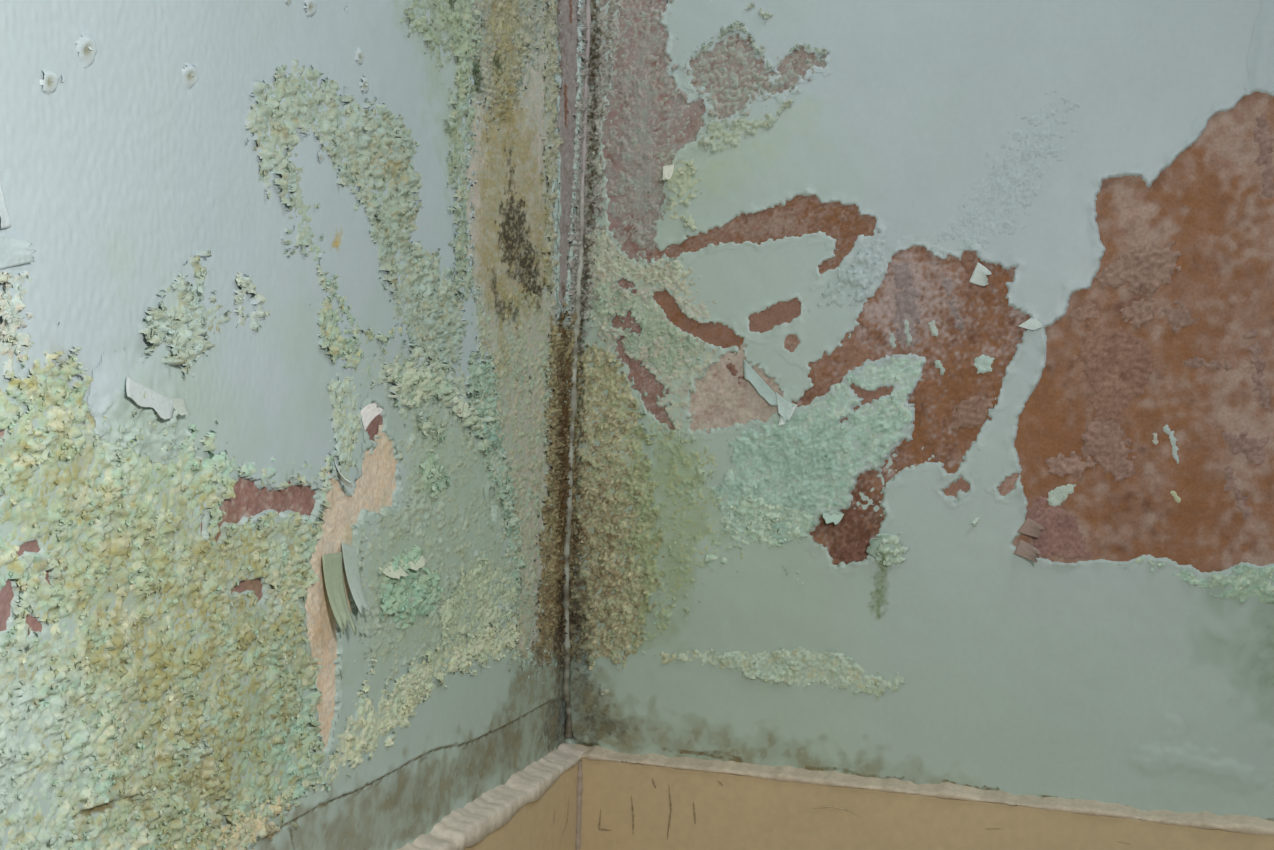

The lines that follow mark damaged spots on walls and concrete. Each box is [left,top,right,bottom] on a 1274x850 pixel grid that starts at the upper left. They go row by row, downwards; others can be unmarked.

damp [472,56,502,92]
peeling [0,169,36,269]
damp [494,150,545,320]
damp [545,0,601,748]
peeling [462,0,1274,684]
peeling [0,525,59,652]
peeling [189,394,405,769]